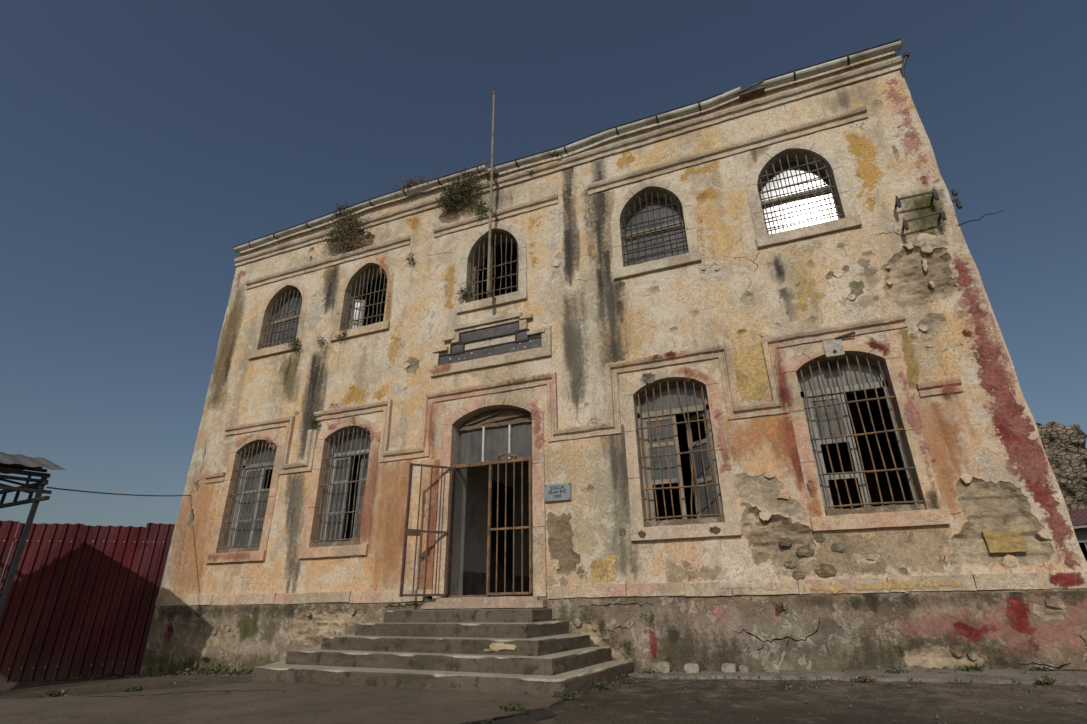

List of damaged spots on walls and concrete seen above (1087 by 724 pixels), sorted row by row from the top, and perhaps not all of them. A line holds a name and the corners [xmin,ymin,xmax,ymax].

peeling [680,161,719,237]
water stain [563,161,625,364]
water stain [284,350,327,458]
water stain [564,298,584,407]
flaking render [710,242,1085,670]
rust [426,468,437,588]
flaking render [546,511,618,586]
crack [732,618,820,650]